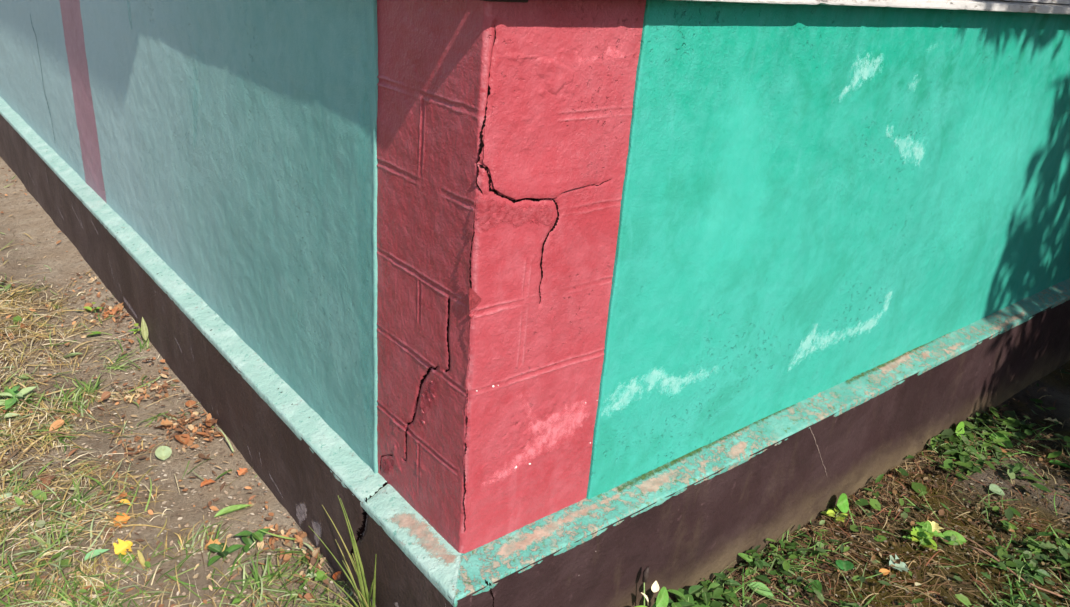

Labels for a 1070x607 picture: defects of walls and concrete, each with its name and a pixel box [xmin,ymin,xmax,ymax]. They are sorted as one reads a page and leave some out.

crack [350,30,611,561]
flaking render [879,351,930,375]
peeling [505,400,598,475]
flaking render [635,469,675,495]
flaking render [727,441,747,457]
flaking render [496,494,620,562]